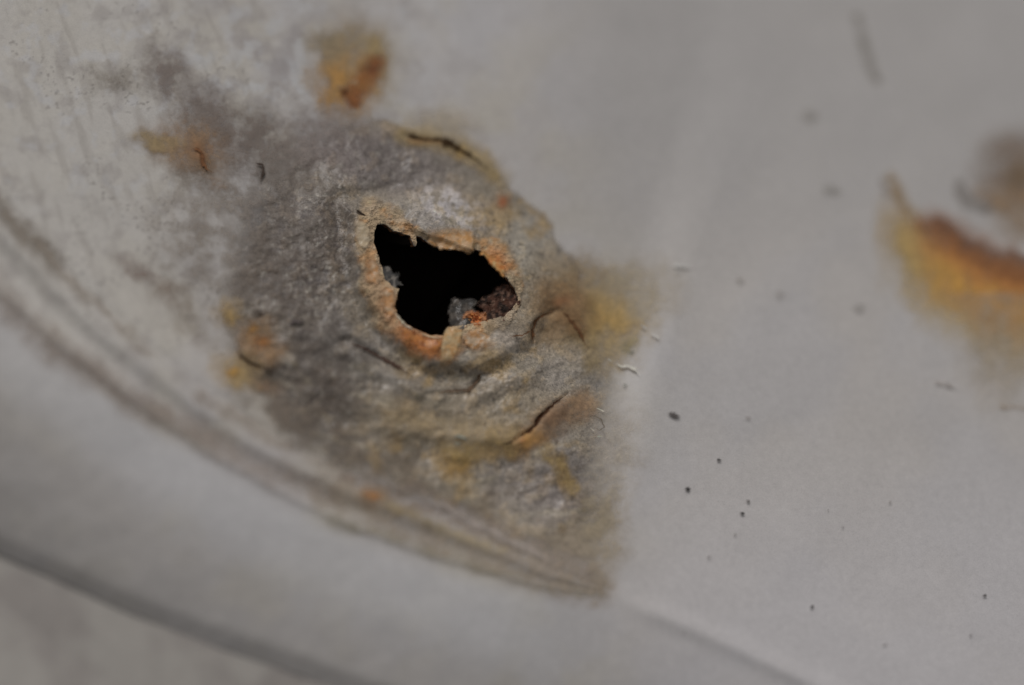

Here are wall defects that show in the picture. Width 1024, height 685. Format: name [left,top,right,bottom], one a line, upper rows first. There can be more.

corrosion [313,26,389,107]
crack [408,134,494,175]
spalling [356,221,514,361]
corrosion [463,310,488,325]
corrosion [890,176,1024,377]
crack [503,397,563,444]